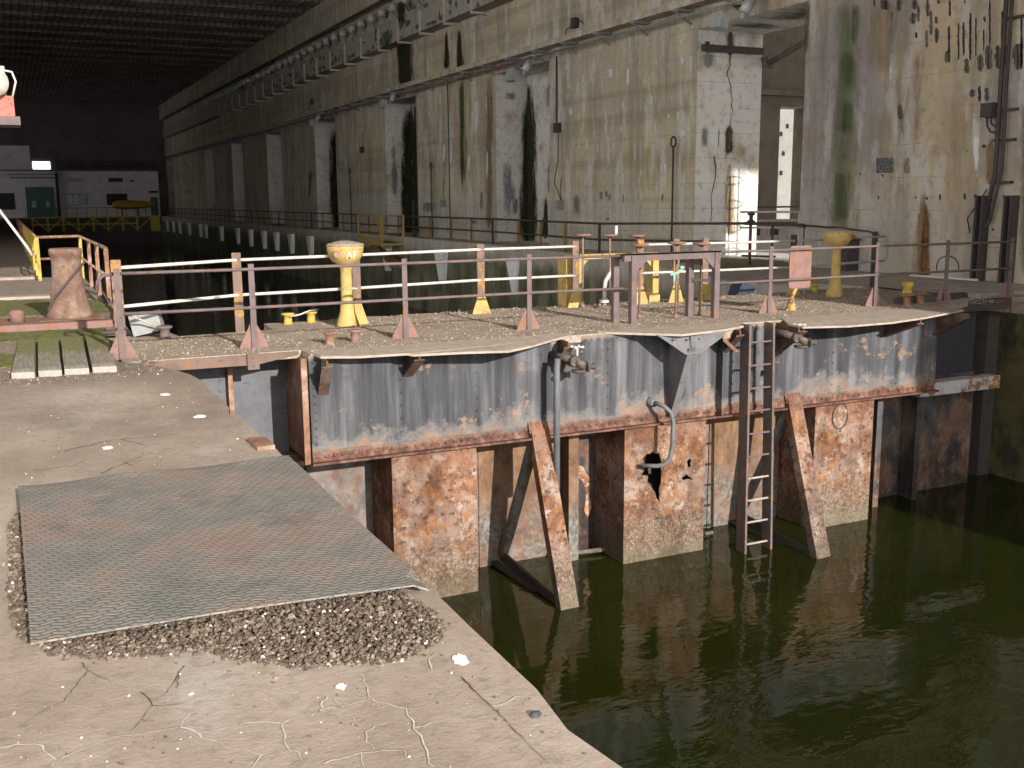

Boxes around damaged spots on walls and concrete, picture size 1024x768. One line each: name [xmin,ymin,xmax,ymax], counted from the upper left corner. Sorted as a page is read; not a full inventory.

water stain [410,92,442,233]
water stain [442,77,518,227]
water stain [835,175,847,218]
corrosion [914,196,930,275]
crack [1,663,547,767]